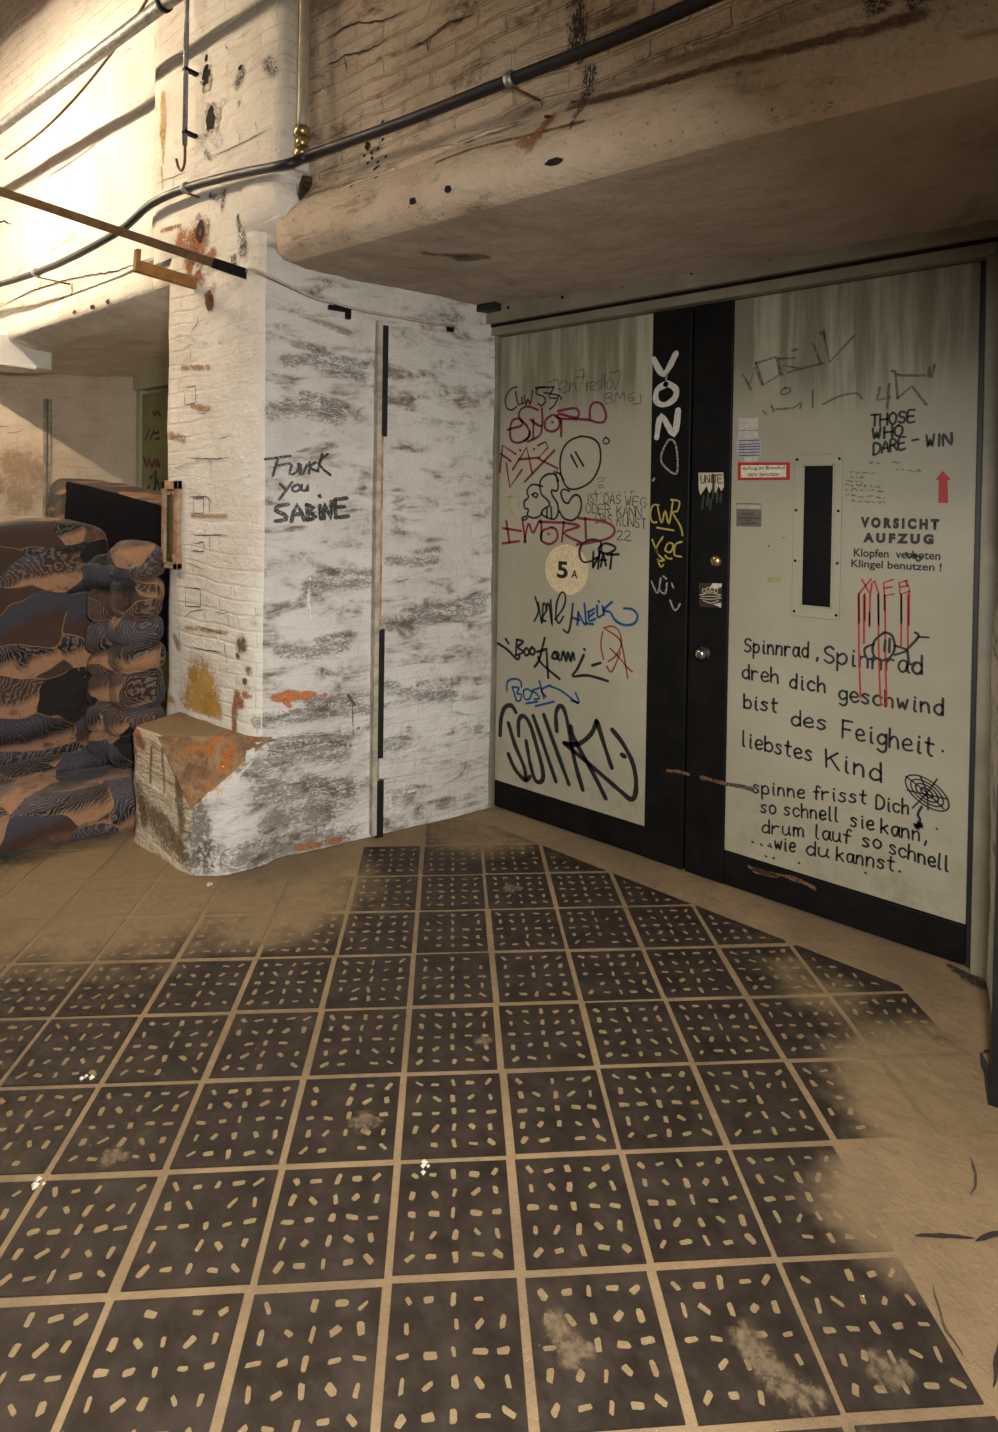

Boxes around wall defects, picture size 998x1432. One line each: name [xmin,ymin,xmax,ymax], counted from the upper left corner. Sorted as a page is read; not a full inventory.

crack [321,12,474,70]
damp [566,0,597,128]
rust [160,219,216,310]
spalling [158,736,272,810]